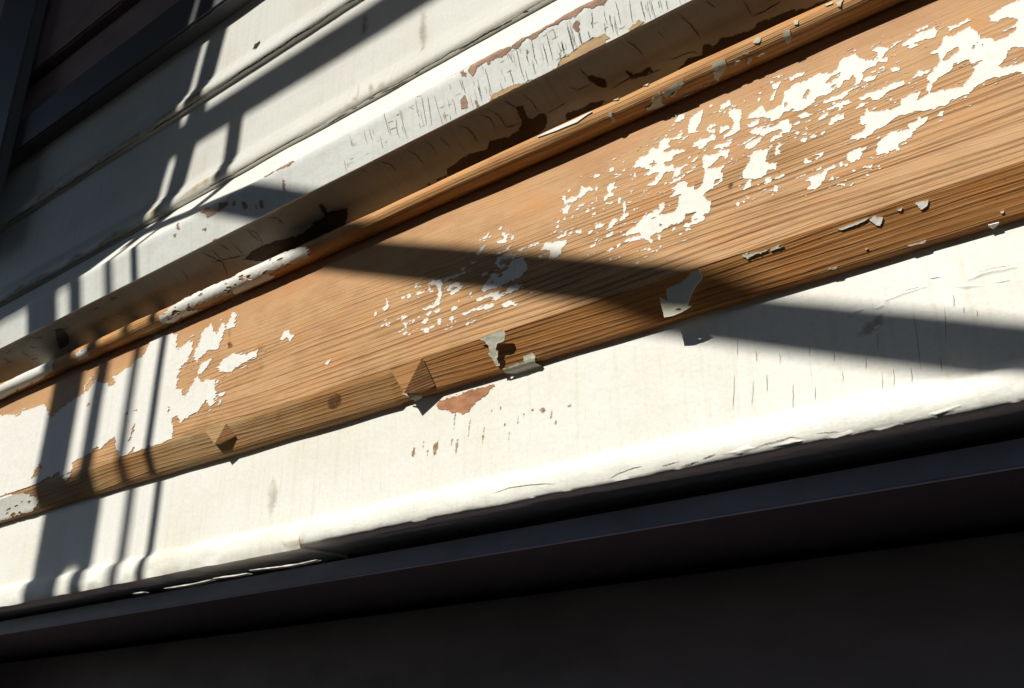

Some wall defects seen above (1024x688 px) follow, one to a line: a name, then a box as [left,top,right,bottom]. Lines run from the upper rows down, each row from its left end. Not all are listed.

crack [192,0,699,198]
peeling [374,0,1024,336]
peeling [0,200,348,522]
peeling [436,384,494,414]
peeling [478,330,541,374]
crack [866,276,978,389]